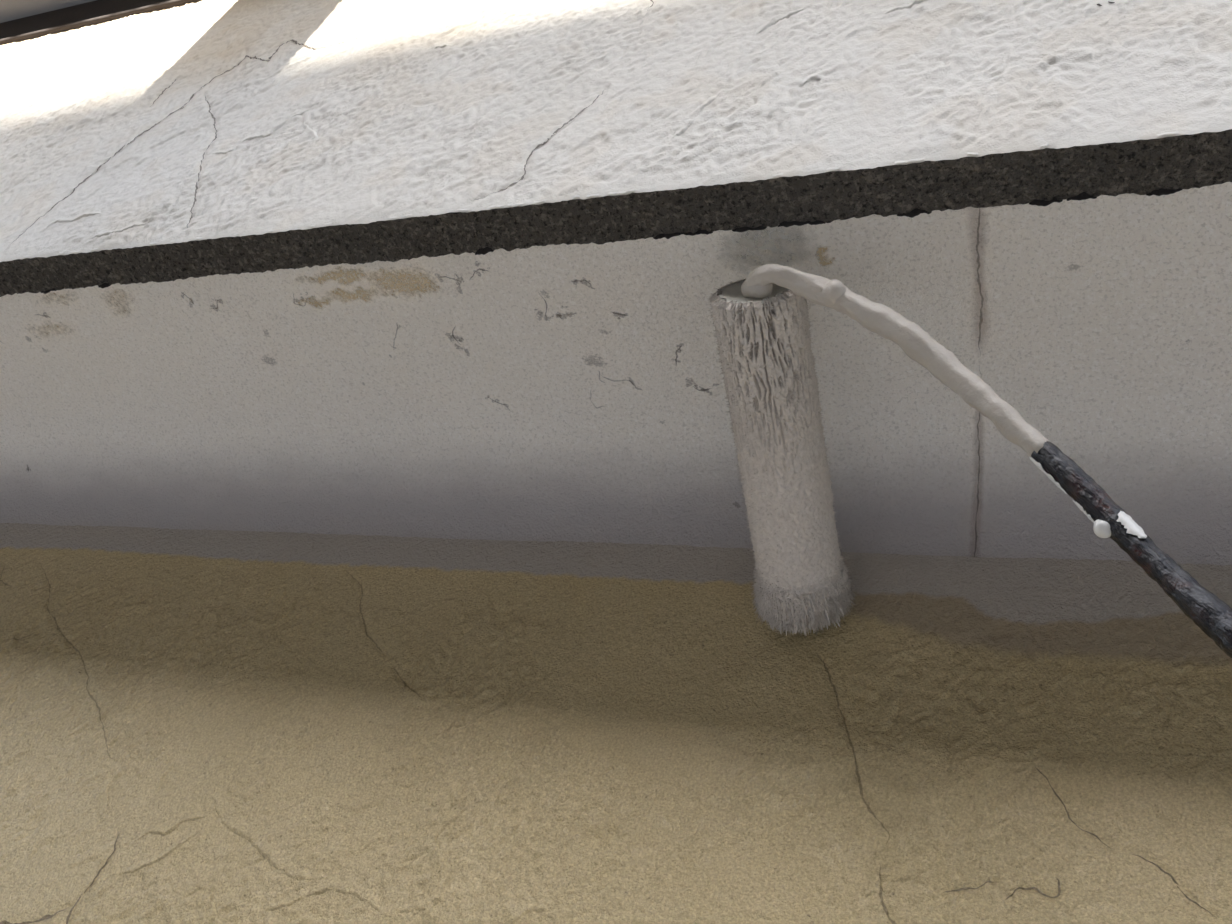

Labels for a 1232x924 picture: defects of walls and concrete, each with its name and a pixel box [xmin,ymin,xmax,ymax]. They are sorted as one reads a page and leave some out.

crack [7,28,374,248]
crack [473,92,603,202]
crack [0,835,118,924]
crack [872,871,895,924]